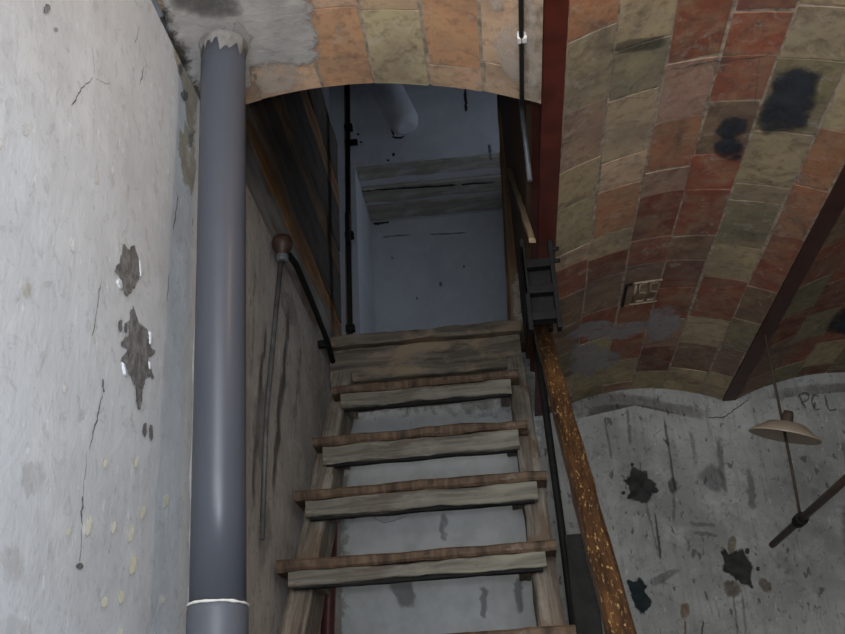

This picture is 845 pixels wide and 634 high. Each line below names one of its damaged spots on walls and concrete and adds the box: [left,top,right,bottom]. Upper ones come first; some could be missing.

leakage [175,0,234,14]
spalling [116,245,143,296]
spalling [118,306,155,409]
crack [89,379,105,449]
spalling [142,422,153,441]
peeling [621,463,658,503]
crack [75,497,83,569]
peeling [721,537,771,597]
peeling [627,577,652,613]